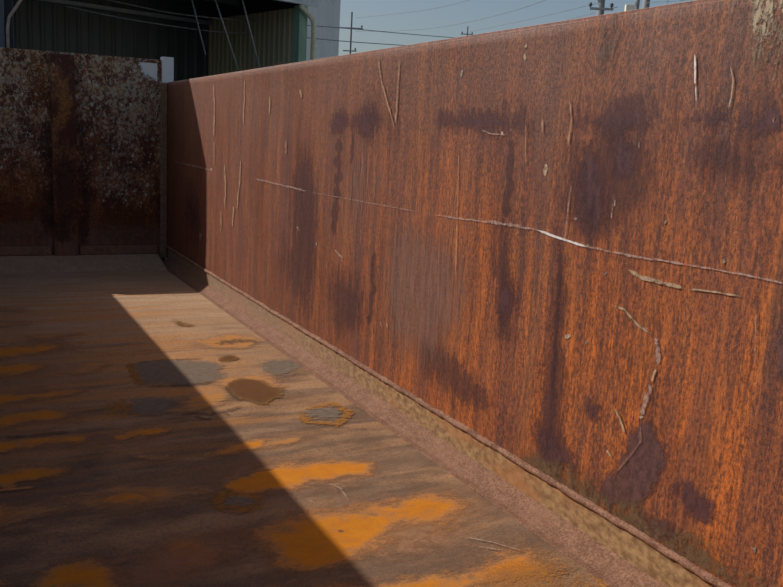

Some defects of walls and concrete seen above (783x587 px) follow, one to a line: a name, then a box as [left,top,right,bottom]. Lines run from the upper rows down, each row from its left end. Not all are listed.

corrosion [330,100,400,232]
corrosion [437,100,534,216]
water stain [102,354,301,417]
corrosion [179,373,286,412]
corrosion [536,228,576,475]
corrosion [0,463,71,491]
corrosion [30,556,128,587]
corrosion [205,437,381,494]
corrosion [245,487,573,587]
corrosion [600,415,679,542]
water stain [519,449,775,587]
corrosion [671,479,715,523]